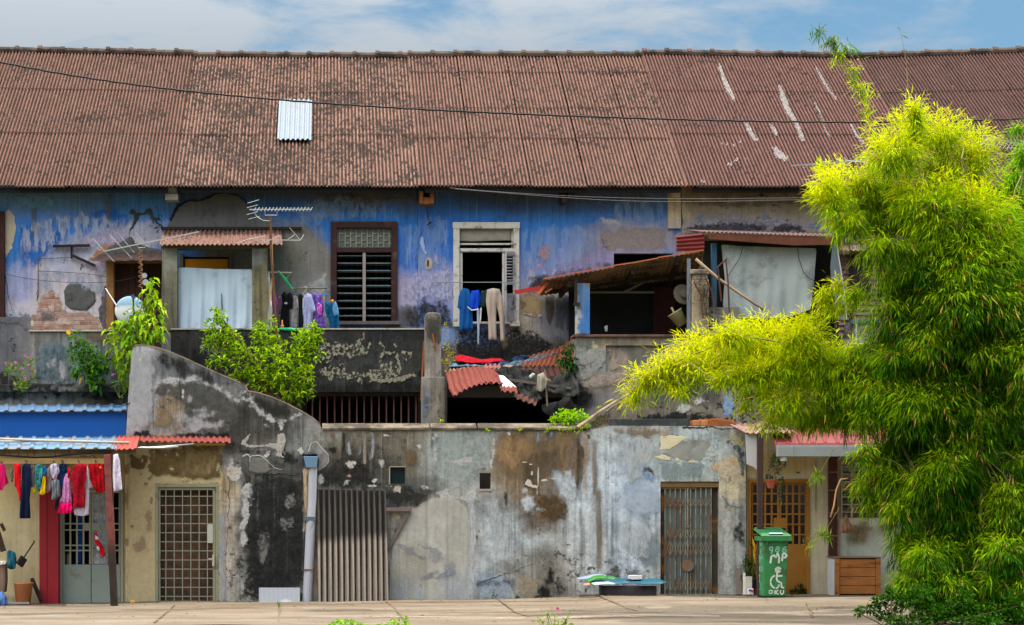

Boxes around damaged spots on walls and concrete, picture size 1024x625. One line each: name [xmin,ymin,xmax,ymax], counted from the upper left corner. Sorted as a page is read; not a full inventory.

crack [129,208,163,236]
peeling [601,227,680,251]
peeling [692,213,819,228]
spalling [5,194,128,383]
leakage [402,300,552,361]
peeling [314,339,416,384]
peeling [226,458,242,481]
flaking render [241,433,304,458]
peeling [643,418,744,484]
leakage [239,447,304,601]
leakage [317,433,562,599]
leakage [497,431,661,579]